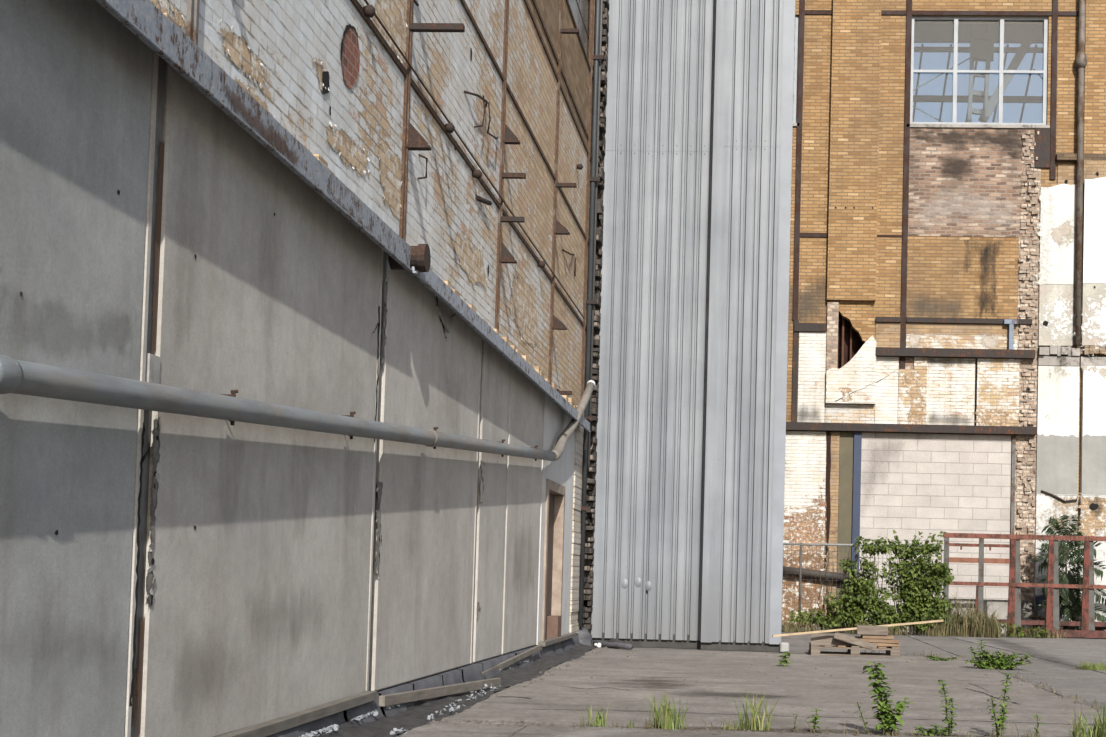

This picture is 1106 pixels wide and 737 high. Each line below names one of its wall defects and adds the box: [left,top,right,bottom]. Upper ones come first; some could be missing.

peeling [216,20,276,119]
flaking render [340,24,360,89]
peeling [371,0,408,66]
corrosion [225,86,299,165]
peeling [311,55,402,222]
spalling [827,301,871,343]
spalling [916,129,1106,620]
peeling [782,480,839,628]